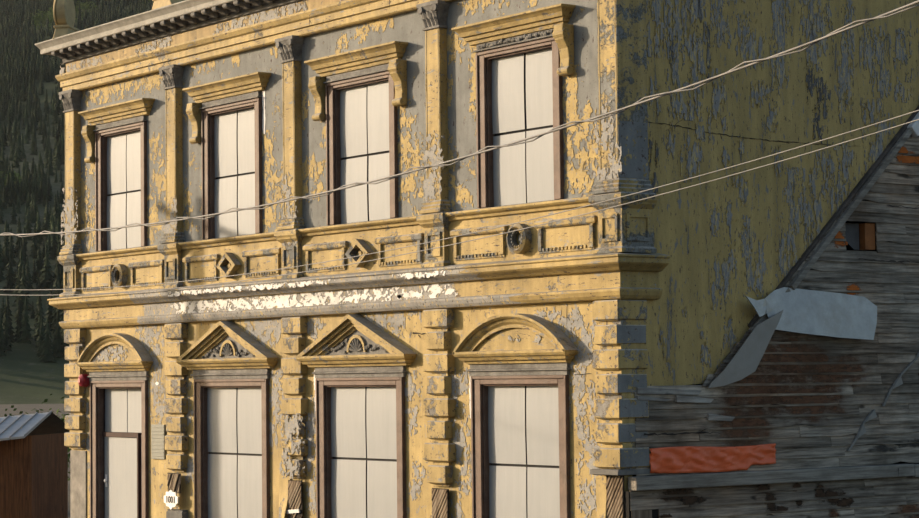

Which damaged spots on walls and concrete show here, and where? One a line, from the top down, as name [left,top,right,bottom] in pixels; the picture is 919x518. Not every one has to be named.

peeling [61,162,103,252]
peeling [82,72,163,107]
peeling [397,96,474,216]
peeling [446,0,510,122]
peeling [562,65,622,194]
crack [648,120,861,147]
peeling [646,0,913,352]
peeling [168,452,194,493]
peeling [269,366,316,518]
peeling [125,263,523,427]
peeling [405,367,472,518]
peeling [533,301,625,518]